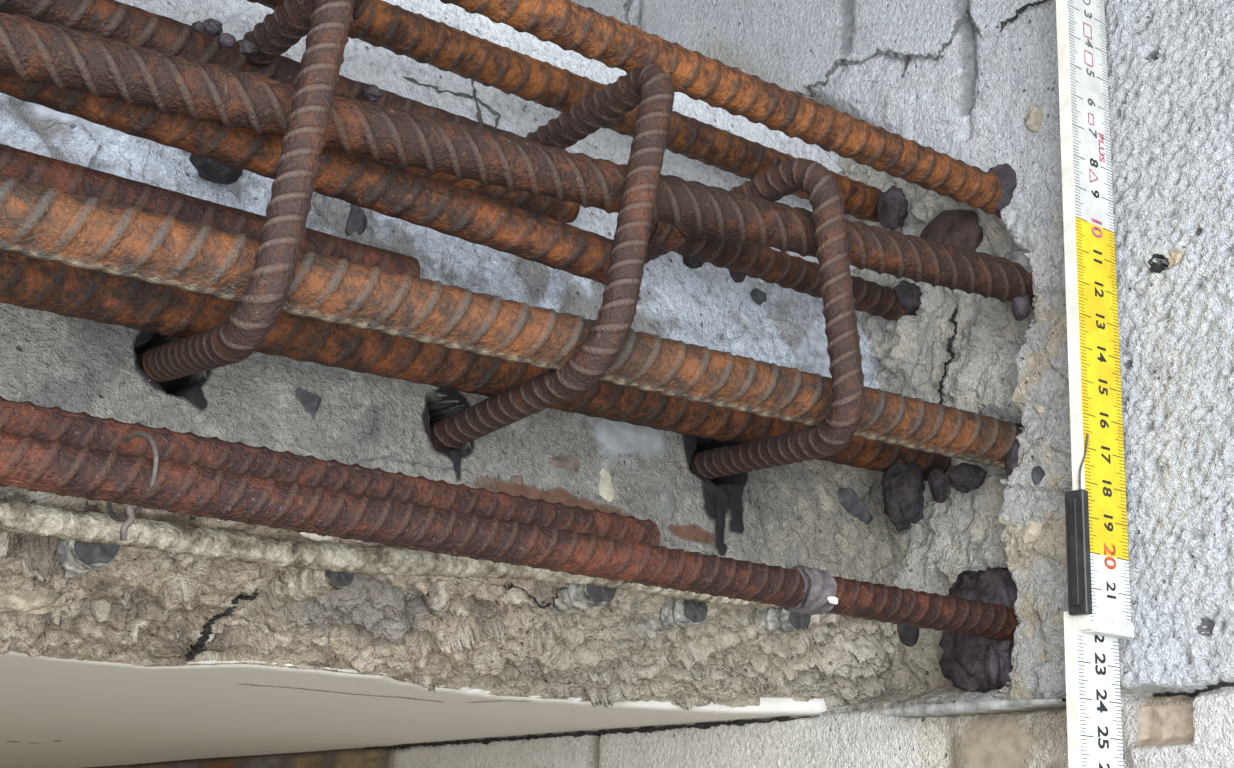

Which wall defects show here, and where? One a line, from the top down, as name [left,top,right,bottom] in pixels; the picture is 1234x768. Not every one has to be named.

spalling [0,144,266,338]
spalling [0,0,301,179]
spalling [314,75,627,285]
spalling [348,0,606,112]
spalling [440,0,1001,219]
spalling [648,111,822,298]
crack [795,0,1047,98]
crack [937,303,960,405]
spalling [0,396,805,607]
rust [482,479,628,517]
rust [671,525,716,543]
crack [184,589,259,661]